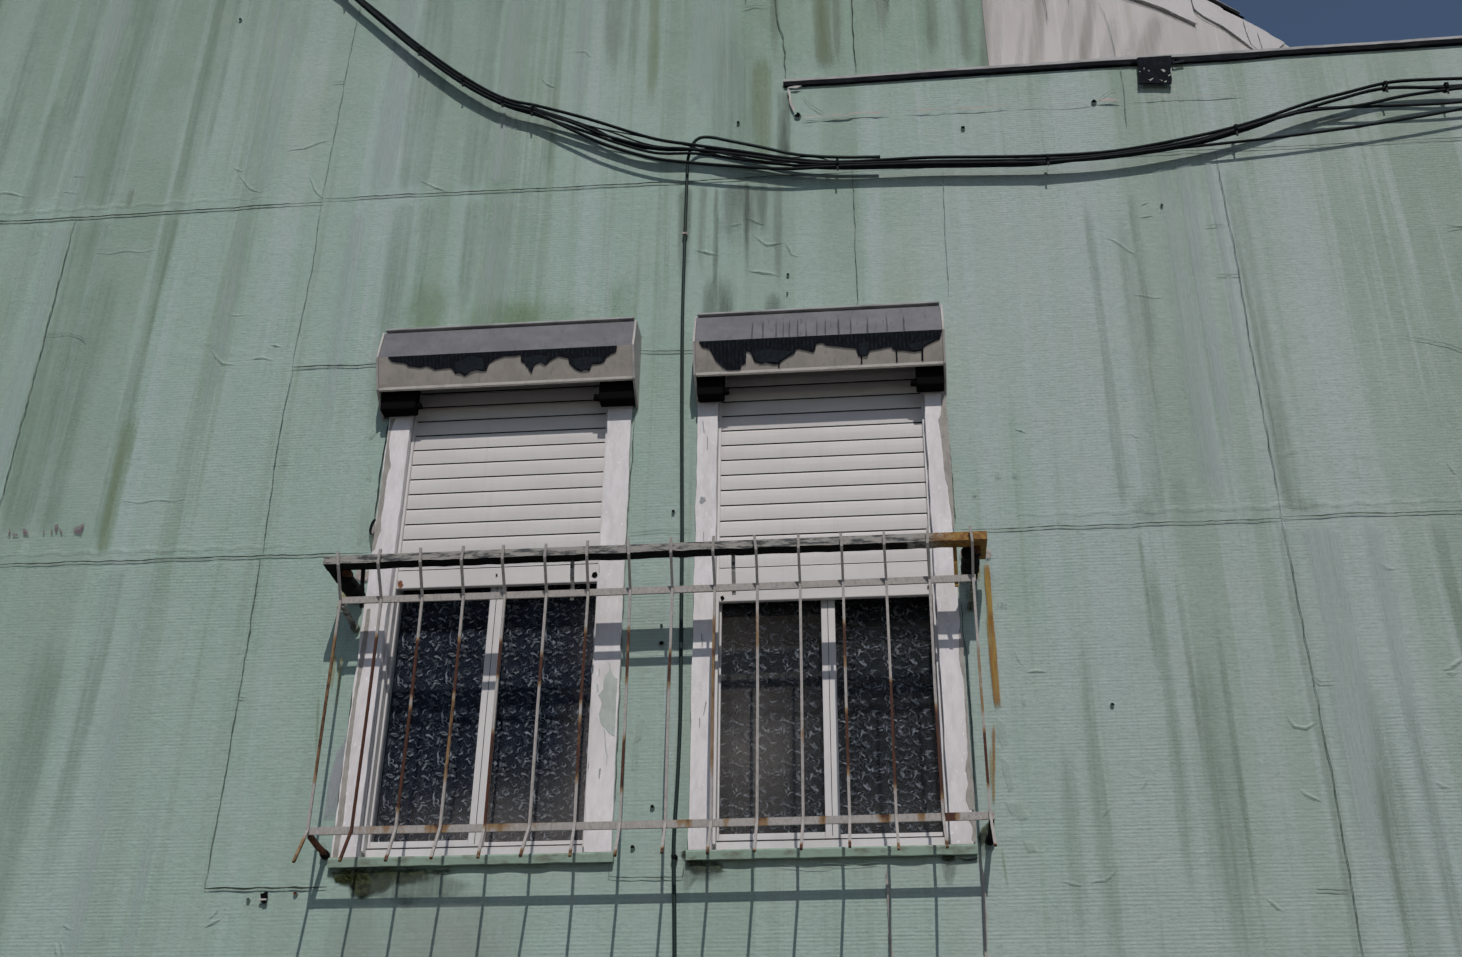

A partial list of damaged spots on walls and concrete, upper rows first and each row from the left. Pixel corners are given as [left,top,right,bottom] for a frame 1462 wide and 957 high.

peeling [388,345,617,376]
peeling [699,329,942,370]
corrosion [984,548,1000,705]
peeling [597,663,617,779]
damp [332,868,449,899]